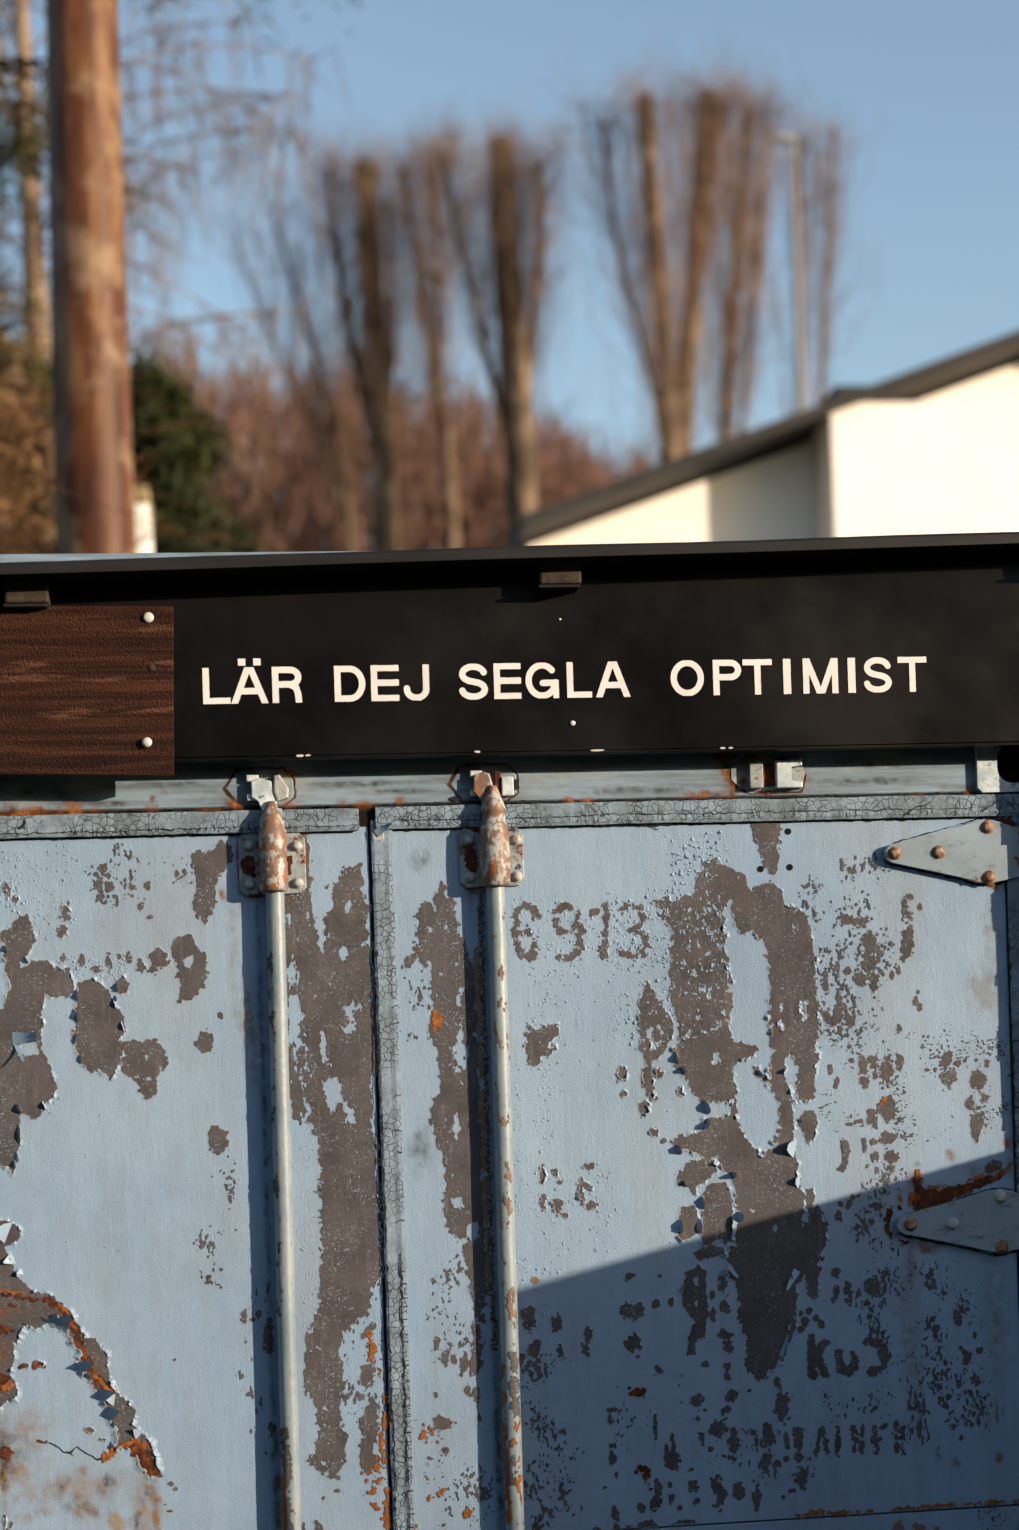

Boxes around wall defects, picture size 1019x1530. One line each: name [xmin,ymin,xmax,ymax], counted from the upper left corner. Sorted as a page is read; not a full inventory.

corrosion [237,850,260,898]
corrosion [463,827,483,894]
peeling [0,838,235,1178]
peeling [194,1225,237,1289]
peeling [239,832,385,1530]
peeling [397,880,602,1530]
peeling [592,821,1018,1530]
corrosion [884,1140,1012,1252]
corrosion [0,1288,117,1394]
peeling [0,1216,178,1513]
corrosion [0,1435,19,1492]